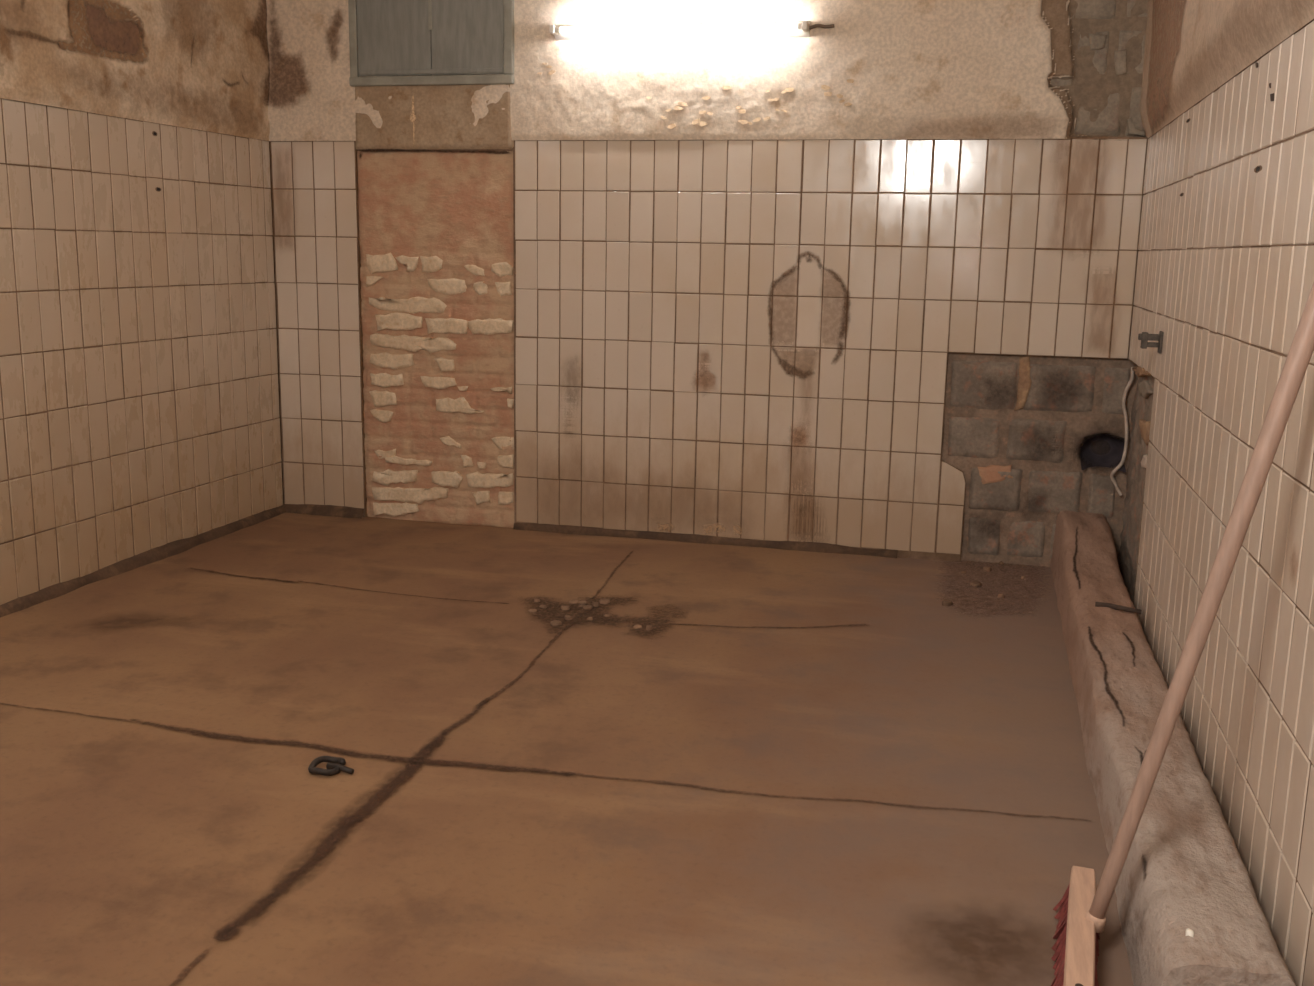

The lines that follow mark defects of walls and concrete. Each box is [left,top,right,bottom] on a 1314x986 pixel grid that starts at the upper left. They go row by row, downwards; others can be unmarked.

spalling [8,0,148,62]
peeling [661,86,732,129]
peeling [736,88,794,125]
spalling [1041,0,1149,139]
peeling [366,253,514,423]
peeling [372,436,514,517]
spalling [941,353,1155,605]
crack [1072,527,1080,589]
crack [1089,627,1146,764]
crack [0,552,1087,986]